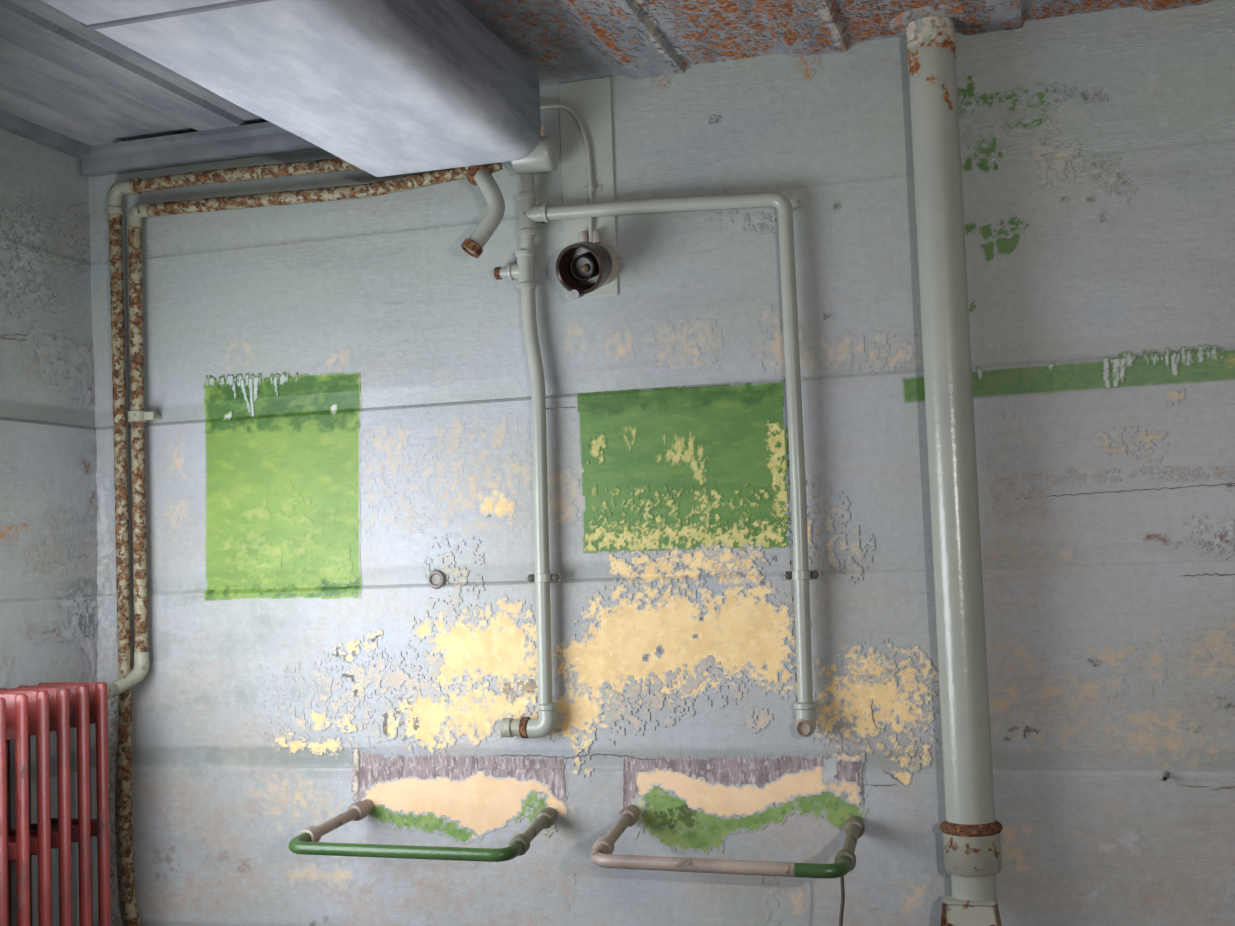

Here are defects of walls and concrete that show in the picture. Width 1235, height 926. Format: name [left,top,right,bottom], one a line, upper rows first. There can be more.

rust [467,0,991,112]
peeling [957,74,1107,174]
peeling [964,215,1032,262]
peeling [84,339,95,408]
peeling [25,427,118,682]
peeling [806,473,875,585]
crack [1014,483,1235,499]
peeling [108,413,798,926]
peeling [810,638,942,785]
crack [1182,783,1235,791]
peeling [749,846,946,926]